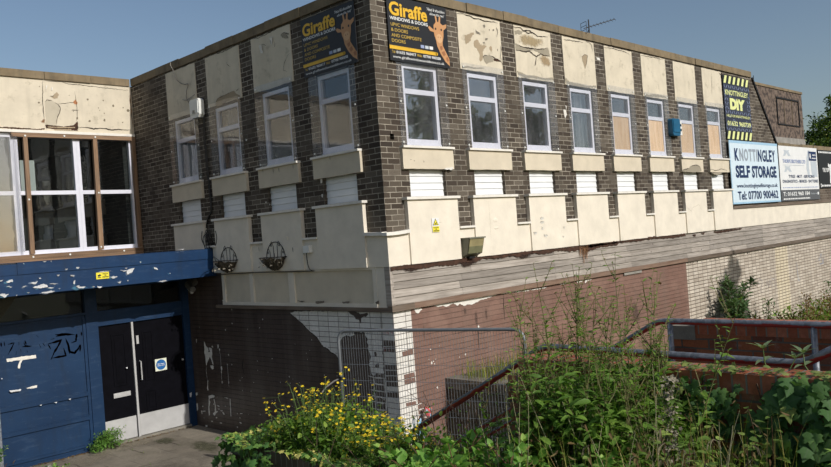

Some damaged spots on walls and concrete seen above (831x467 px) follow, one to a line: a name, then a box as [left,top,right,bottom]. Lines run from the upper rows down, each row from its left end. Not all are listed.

flaking render [464,32,501,64]
crack [458,13,547,65]
spalling [515,44,550,56]
crack [42,81,123,130]
peeling [0,266,101,298]
peeling [190,339,242,428]
peeling [291,301,388,419]